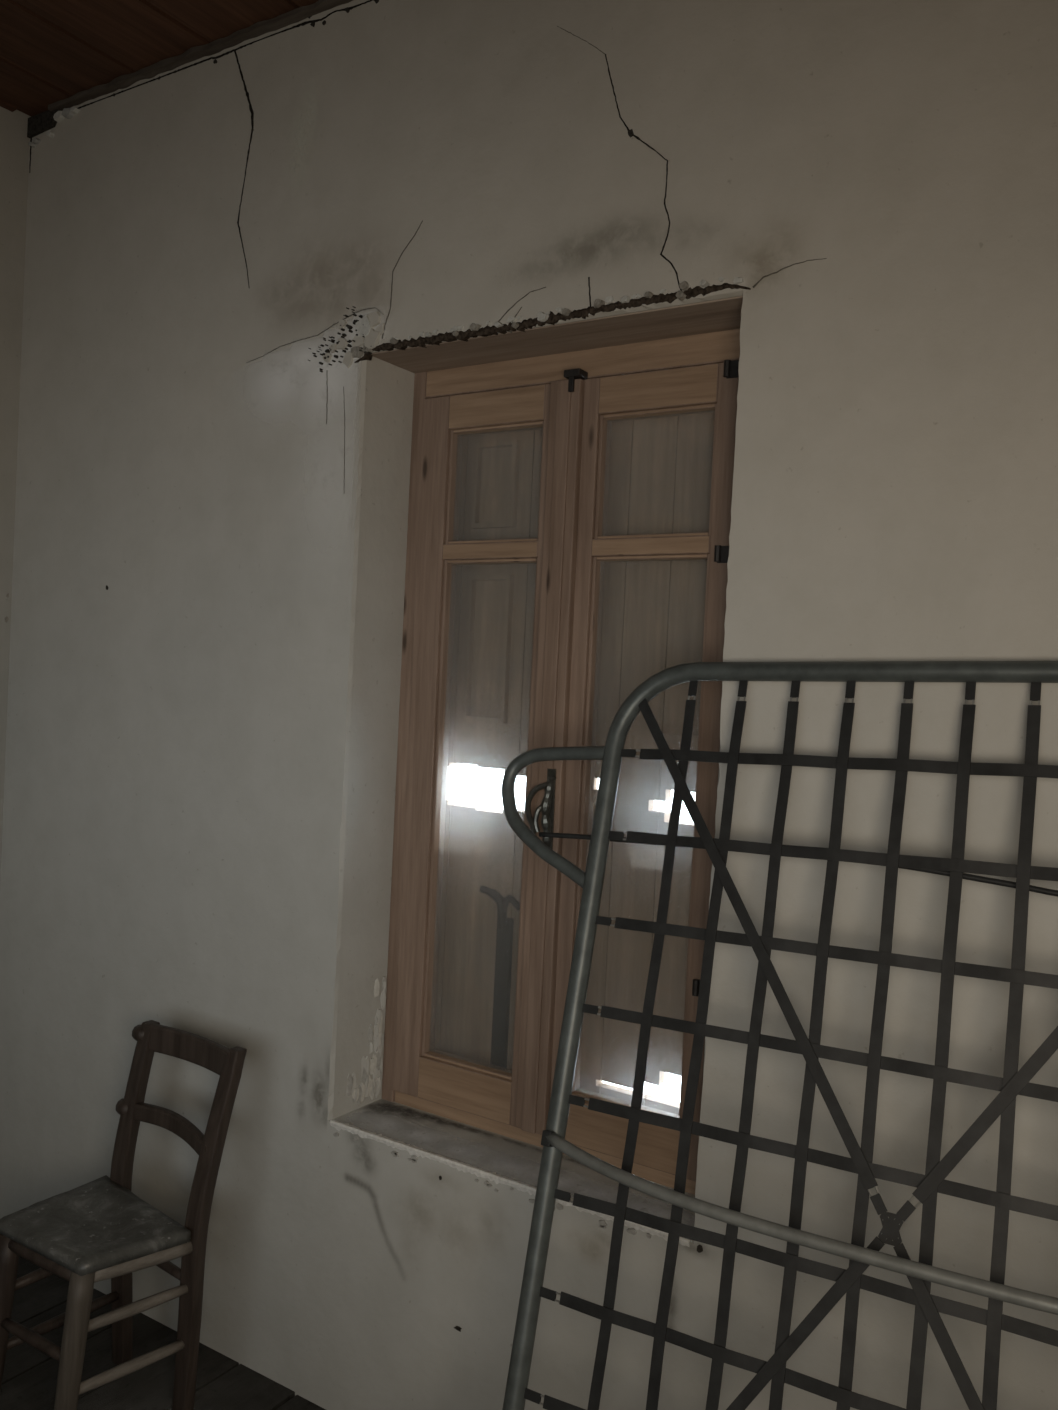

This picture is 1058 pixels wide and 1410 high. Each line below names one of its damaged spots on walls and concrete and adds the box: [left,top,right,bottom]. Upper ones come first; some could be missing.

crack [557,26,682,291]
spalling [308,277,751,372]
crack [752,258,827,288]
peeling [347,976,386,1104]